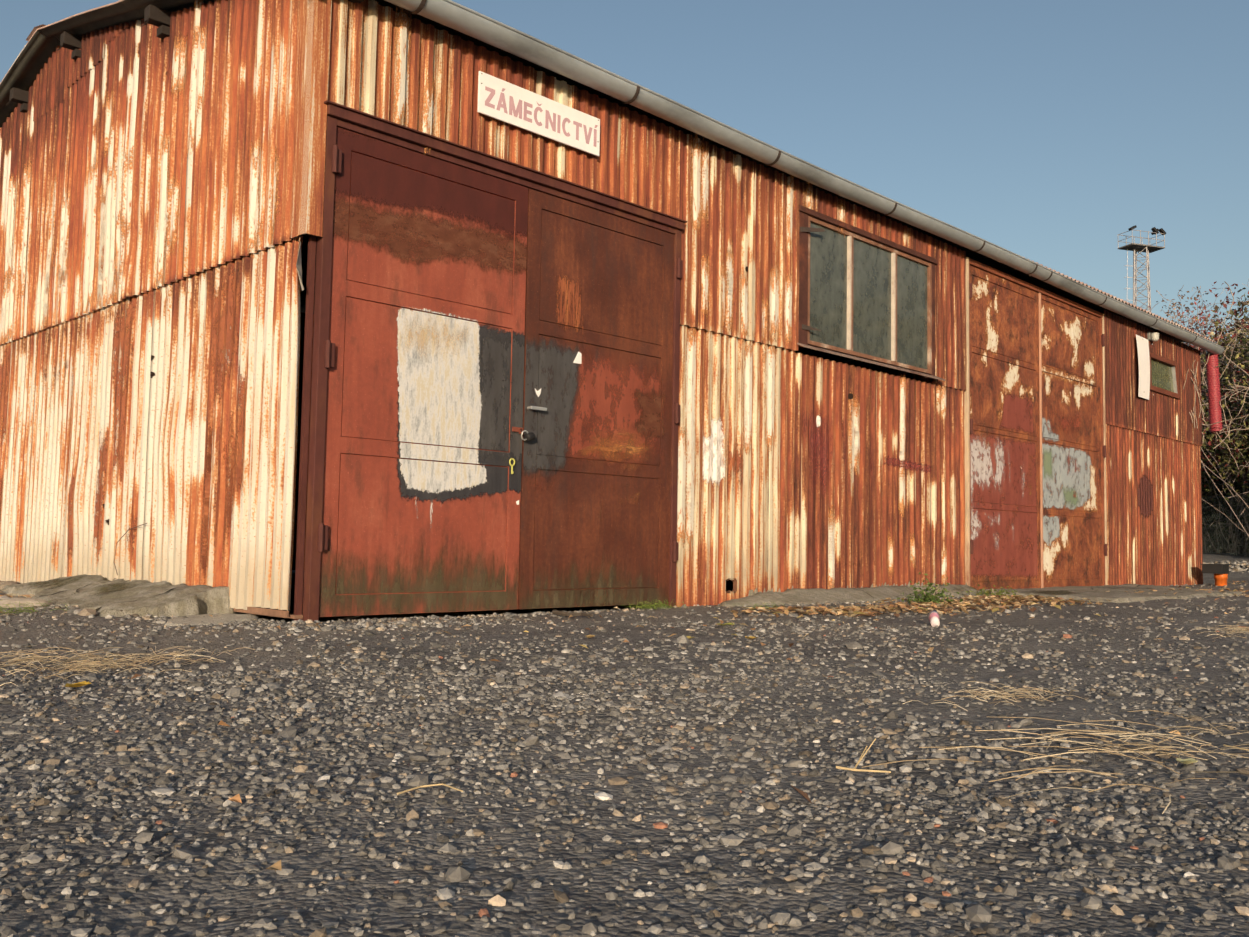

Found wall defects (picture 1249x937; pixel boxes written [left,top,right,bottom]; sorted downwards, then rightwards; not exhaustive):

rust [333,127,528,274]
peeling [971,274,1095,420]
rust [0,351,10,441]
rust [53,475,75,555]
rust [93,301,135,561]
rust [127,493,137,552]
rust [200,266,248,577]
rust [583,390,665,458]
rust [727,440,743,486]
peeling [1083,464,1098,513]
rust [1138,475,1154,517]